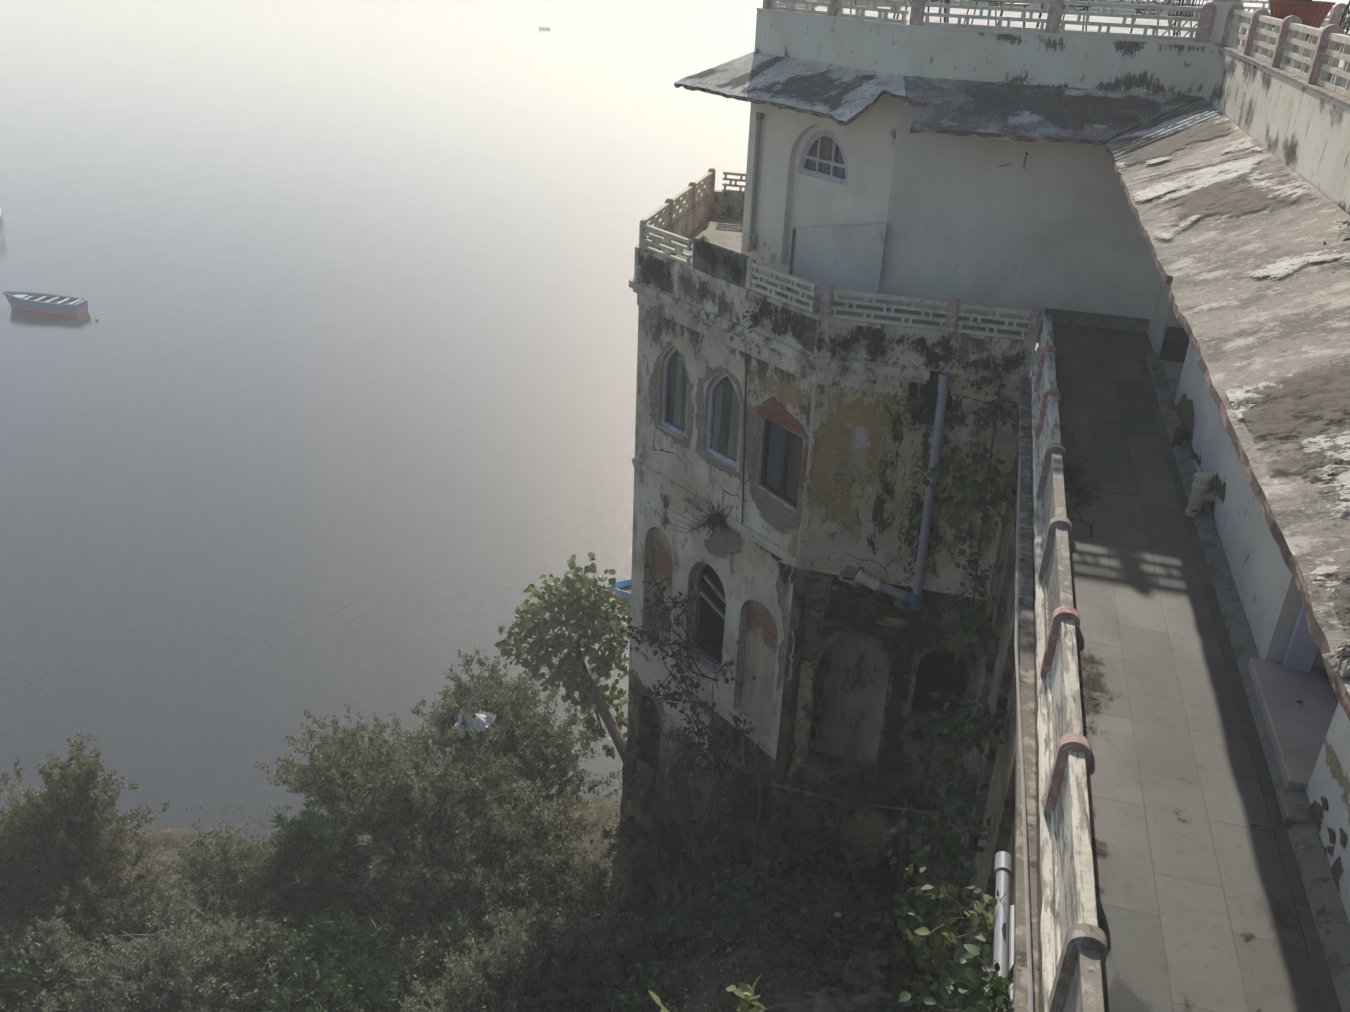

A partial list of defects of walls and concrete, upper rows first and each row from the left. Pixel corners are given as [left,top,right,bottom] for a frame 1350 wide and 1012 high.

leakage [686,46,878,112]
leakage [980,33,1065,52]
leakage [956,41,1316,239]
leakage [636,236,1031,378]
leakage [1242,248,1350,280]
flaking render [745,394,842,535]
leakage [1225,361,1350,517]
leakage [645,309,982,875]
leakage [1307,554,1350,633]
flaking render [775,559,869,775]
peeling [1310,796,1346,894]